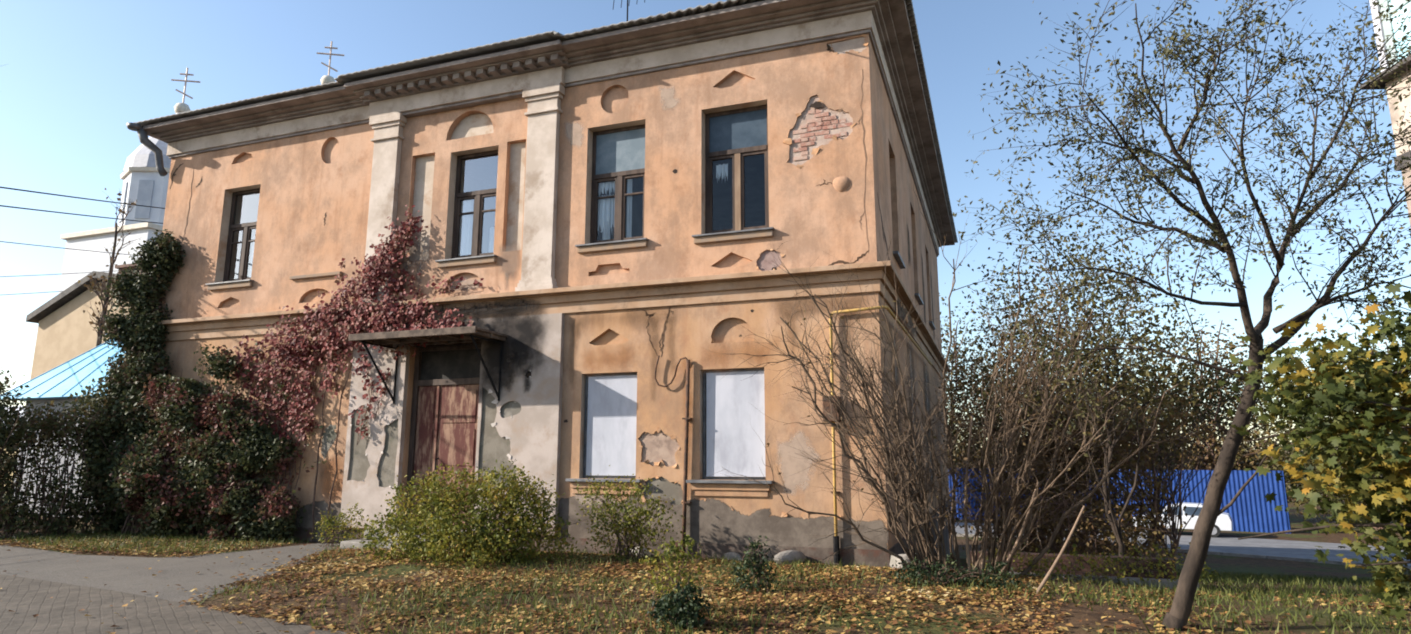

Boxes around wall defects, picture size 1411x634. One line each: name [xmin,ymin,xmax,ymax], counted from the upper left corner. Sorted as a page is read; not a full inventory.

flaking render [783,95,856,168]
flaking render [755,249,785,271]
flaking render [321,404,398,488]
flaking render [477,388,521,490]
flaking render [558,426,889,550]